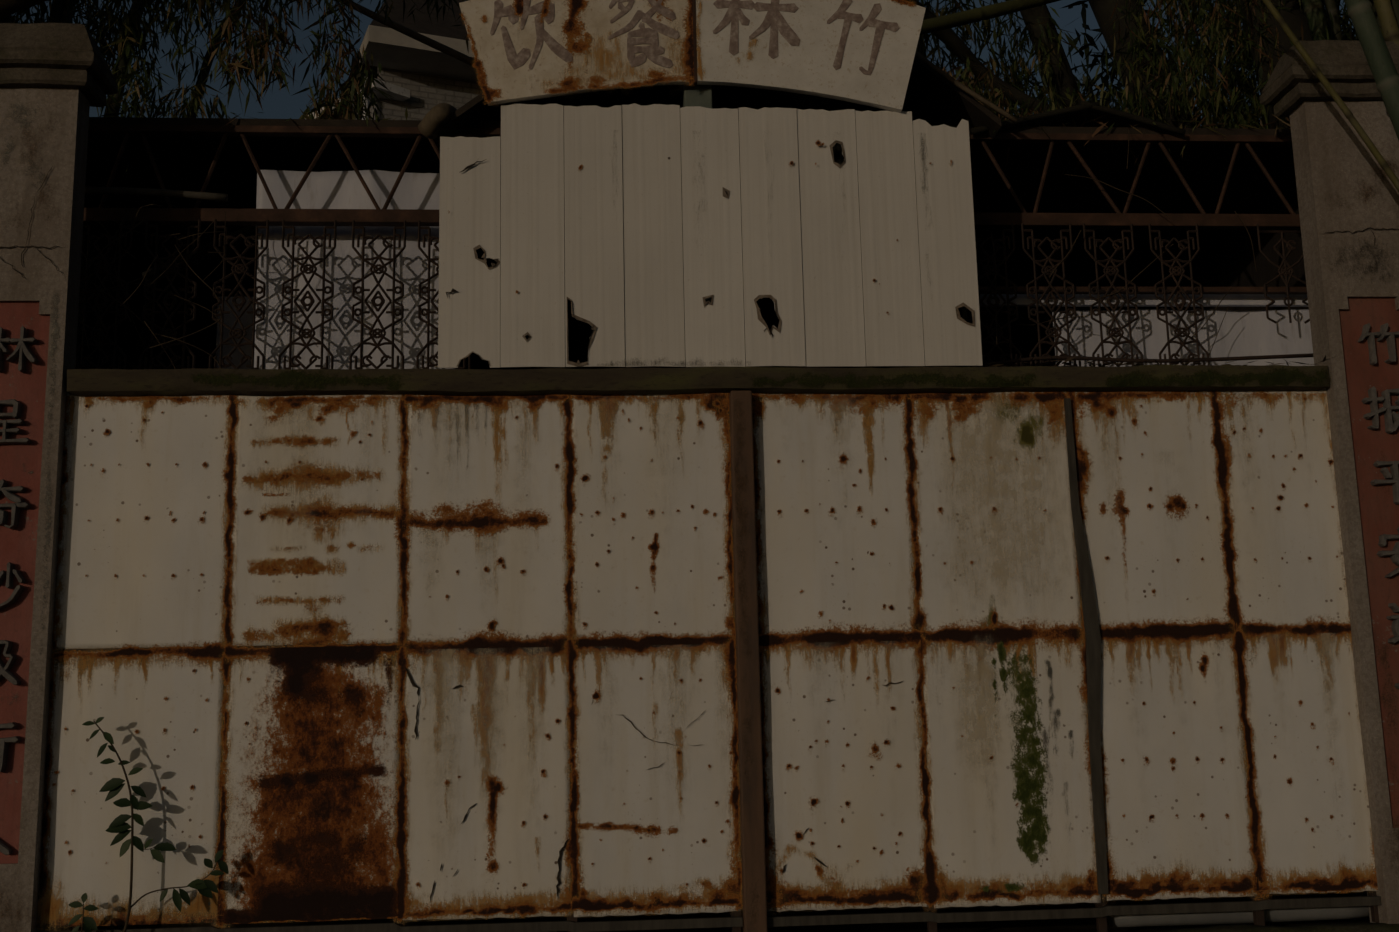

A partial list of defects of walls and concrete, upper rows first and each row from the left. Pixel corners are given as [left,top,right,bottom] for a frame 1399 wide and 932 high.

rust [461,12,502,104]
rust [512,0,523,16]
rust [540,0,705,94]
rust [36,393,743,932]
rust [752,391,1378,910]